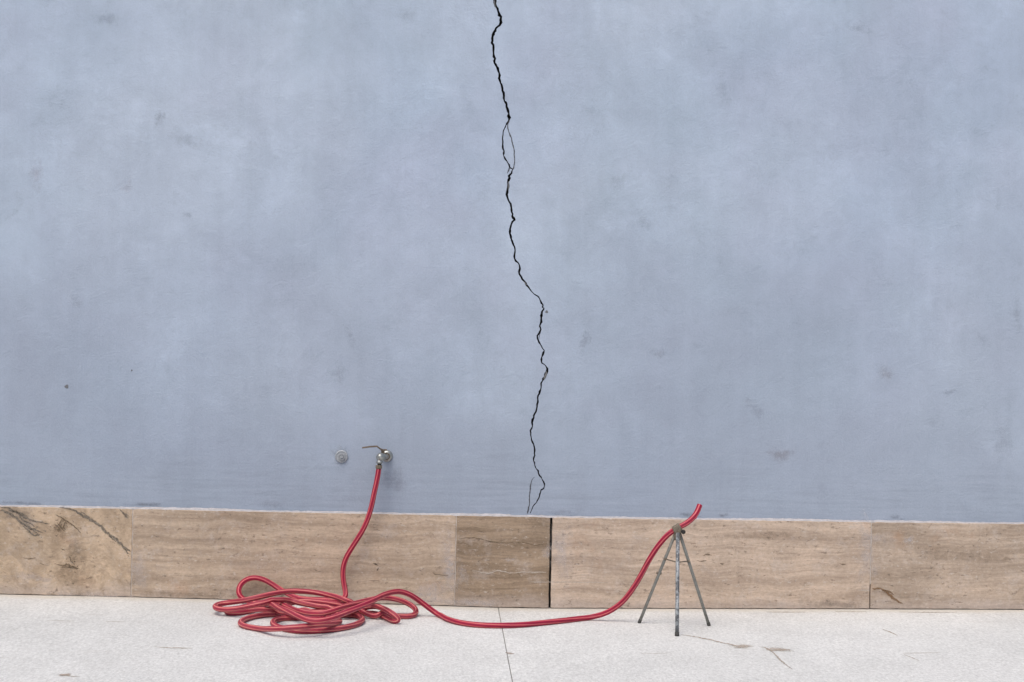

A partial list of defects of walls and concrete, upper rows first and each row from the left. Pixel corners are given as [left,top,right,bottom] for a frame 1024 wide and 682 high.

crack [491,0,548,514]